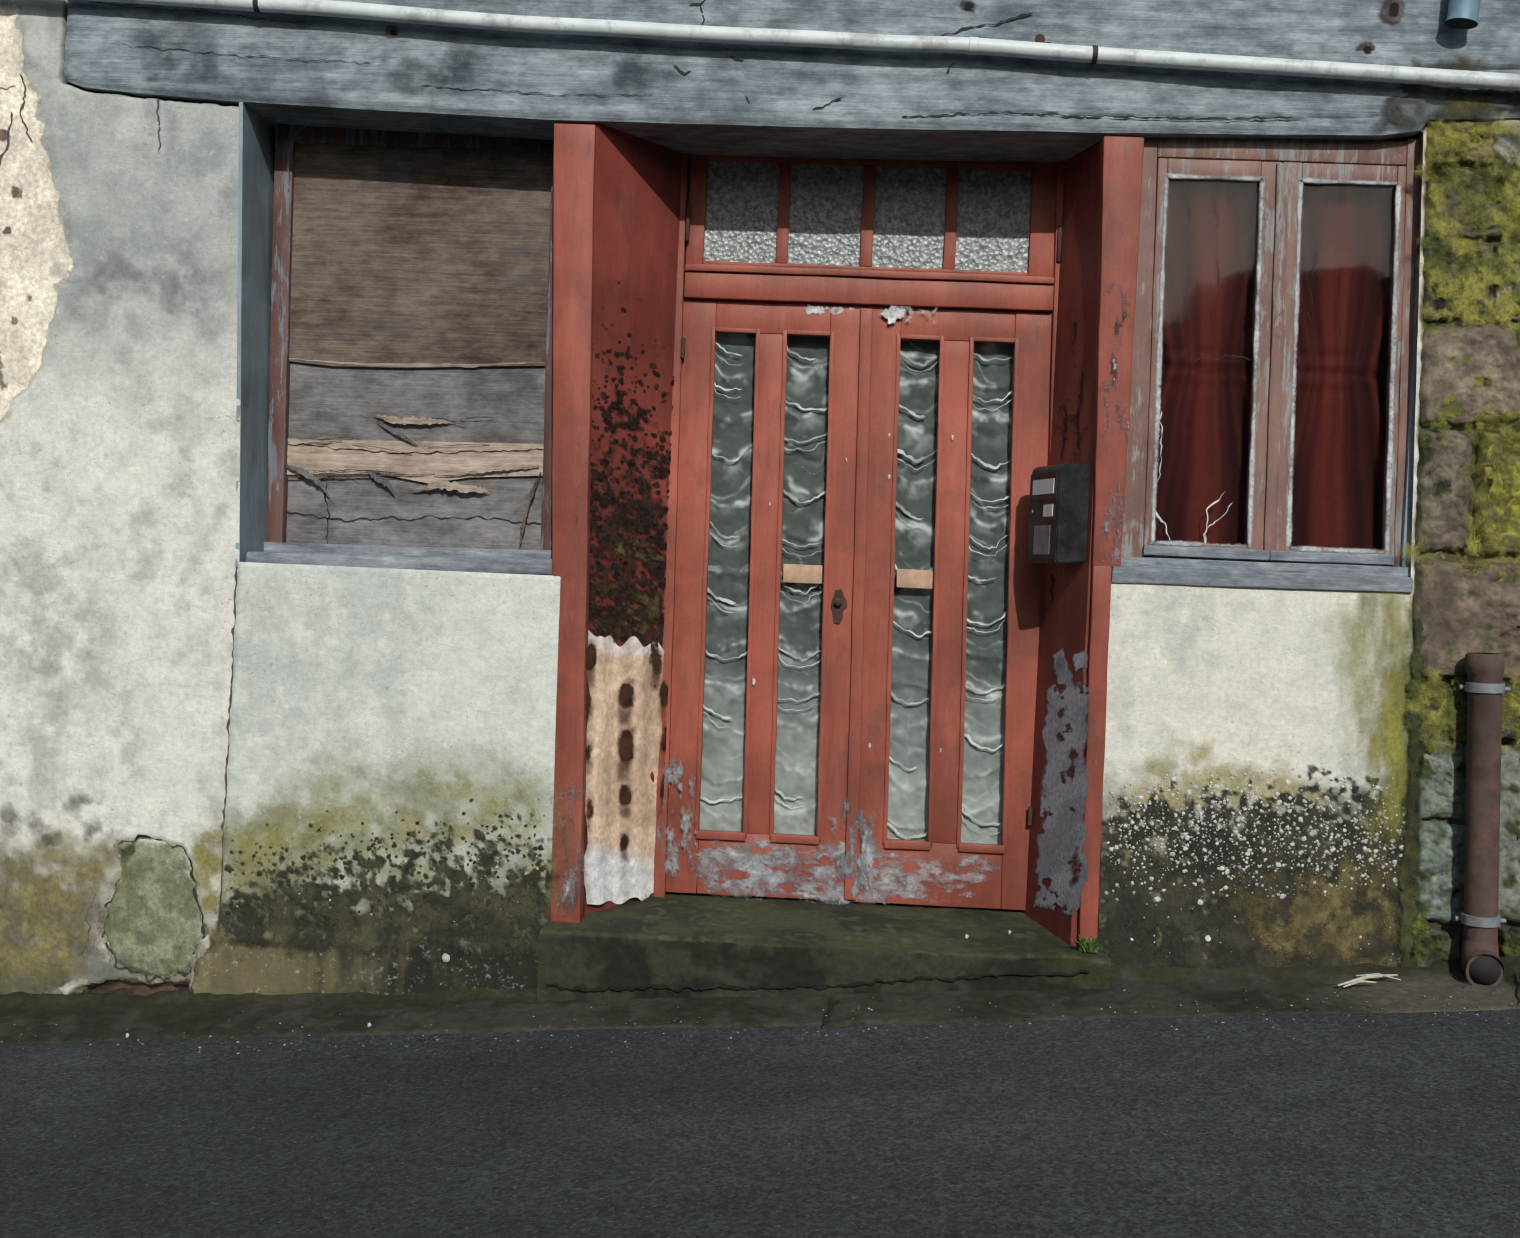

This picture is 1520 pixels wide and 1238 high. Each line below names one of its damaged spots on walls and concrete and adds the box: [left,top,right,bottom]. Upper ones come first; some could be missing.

crack [0,73,33,164]
flaking render [0,3,74,421]
water stain [0,809,124,995]
flaking render [59,934,210,996]
water stain [210,770,557,967]
peeling [657,757,999,904]
peeling [1035,649,1090,915]
water stain [1097,595,1413,969]